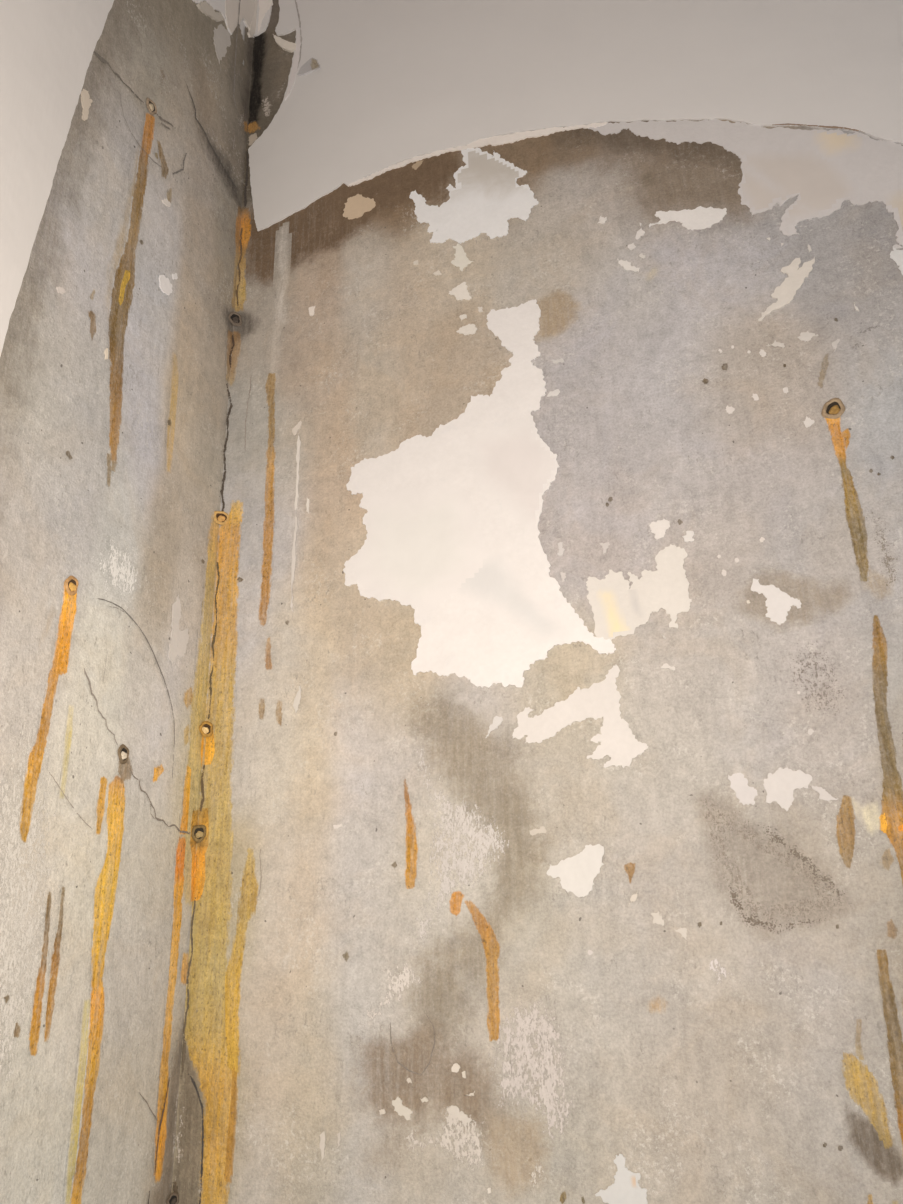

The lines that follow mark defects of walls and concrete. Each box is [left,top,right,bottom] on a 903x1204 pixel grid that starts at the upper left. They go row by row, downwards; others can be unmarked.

corrosion [86,111,174,489]
leakage [197,119,779,346]
peeling [588,119,903,276]
crack [220,335,251,511]
crack [208,562,220,719]
corrosion [824,416,903,883]
crack [131,765,205,835]
corrosion [151,499,260,1204]
spalling [683,783,877,943]
peeling [763,767,812,811]
corrosion [63,775,126,1204]
peeling [595,1154,648,1204]